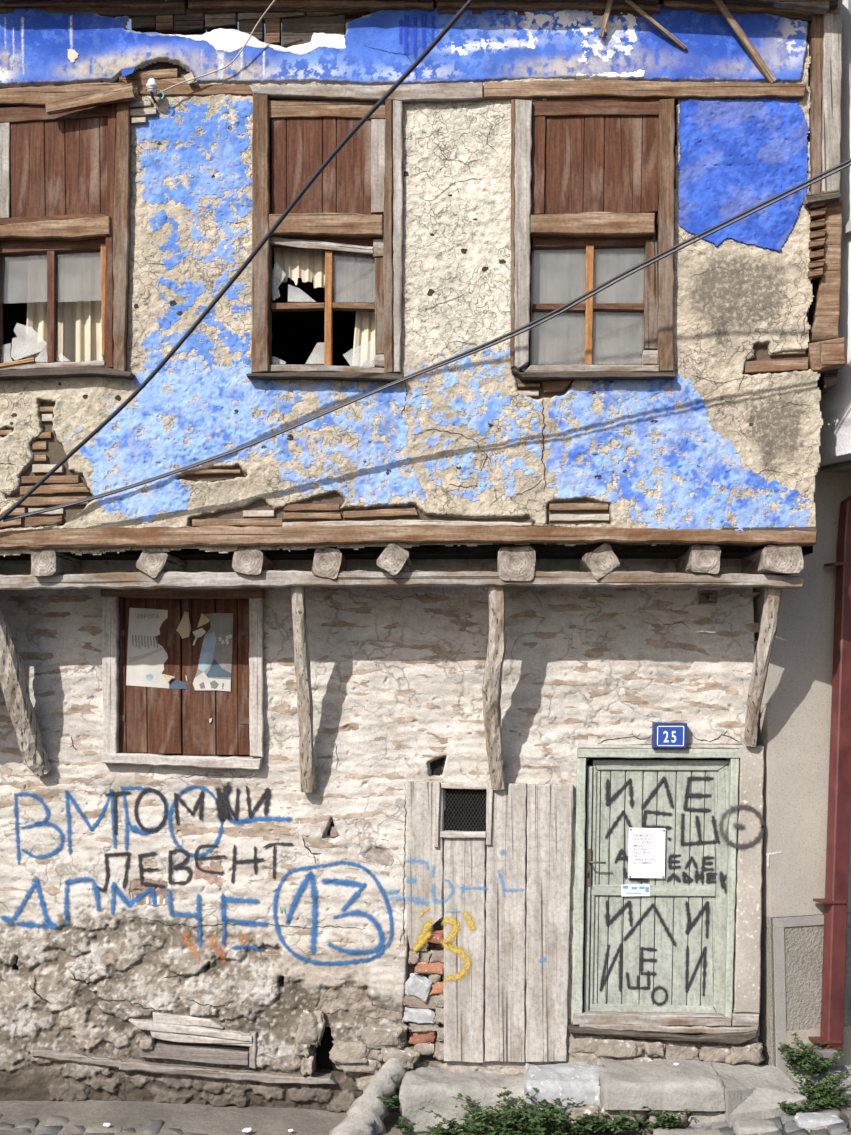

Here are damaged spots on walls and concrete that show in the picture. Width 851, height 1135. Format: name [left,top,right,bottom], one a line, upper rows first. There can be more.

spalling [66,49,79,63]
peeling [162,28,346,55]
peeling [451,11,645,80]
peeling [0,97,811,531]
spalling [293,928,444,1090]